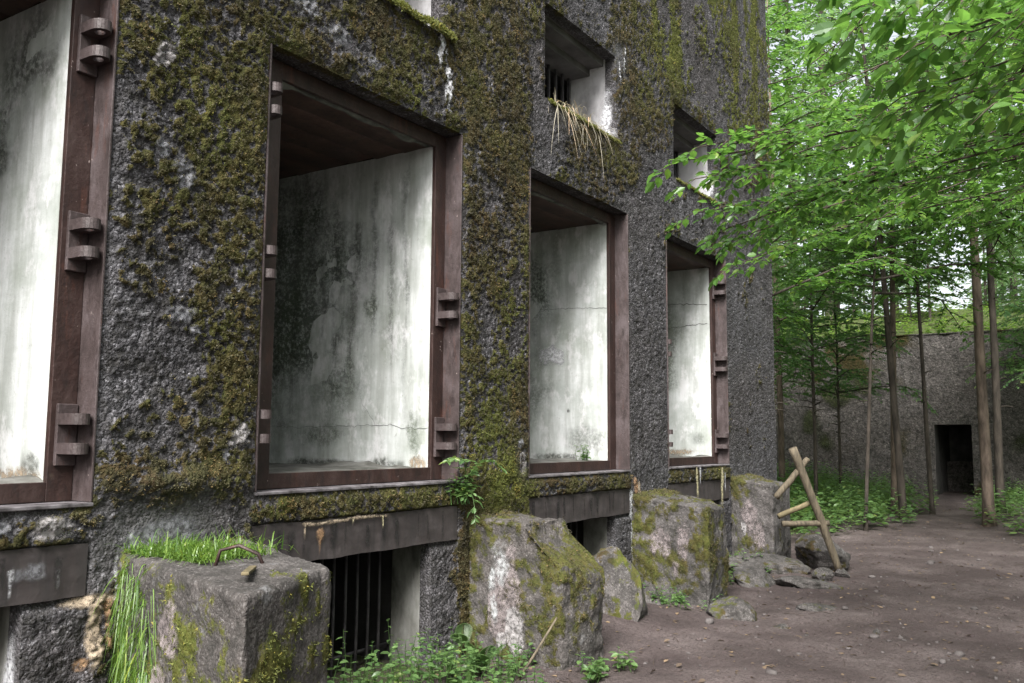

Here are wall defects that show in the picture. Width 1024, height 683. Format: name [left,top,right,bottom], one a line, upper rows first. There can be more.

efflorescence [438,33,453,107]